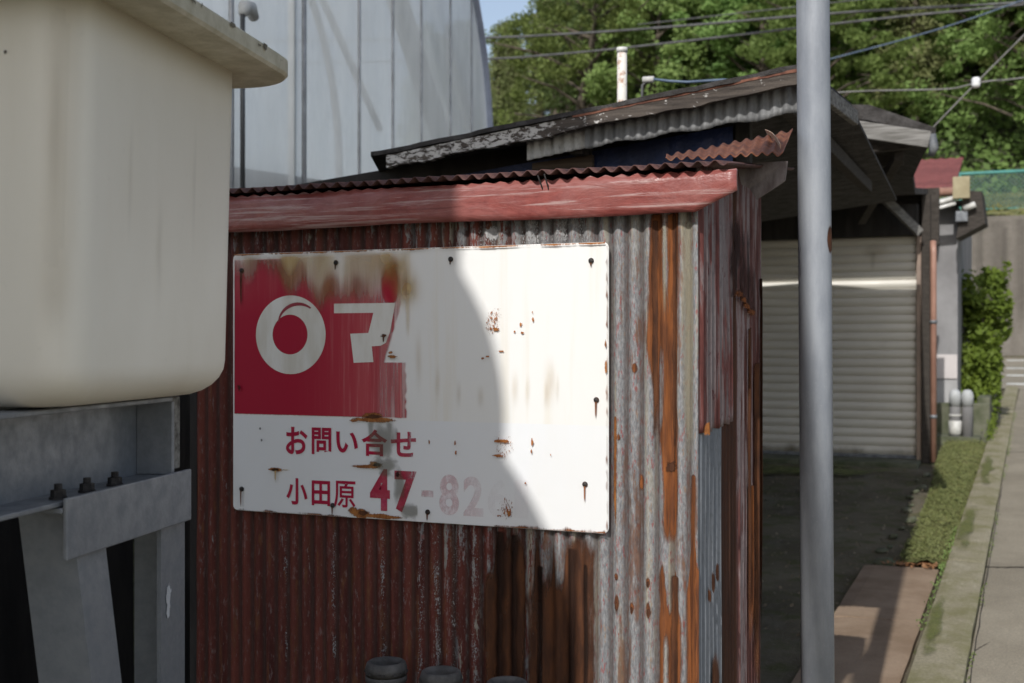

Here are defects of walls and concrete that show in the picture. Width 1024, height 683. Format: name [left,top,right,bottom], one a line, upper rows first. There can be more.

corrosion [234,248,428,294]
corrosion [307,507,401,519]
corrosion [350,412,395,423]
corrosion [484,390,620,683]
corrosion [632,213,678,540]
corrosion [614,475,719,683]
corrosion [747,278,763,678]